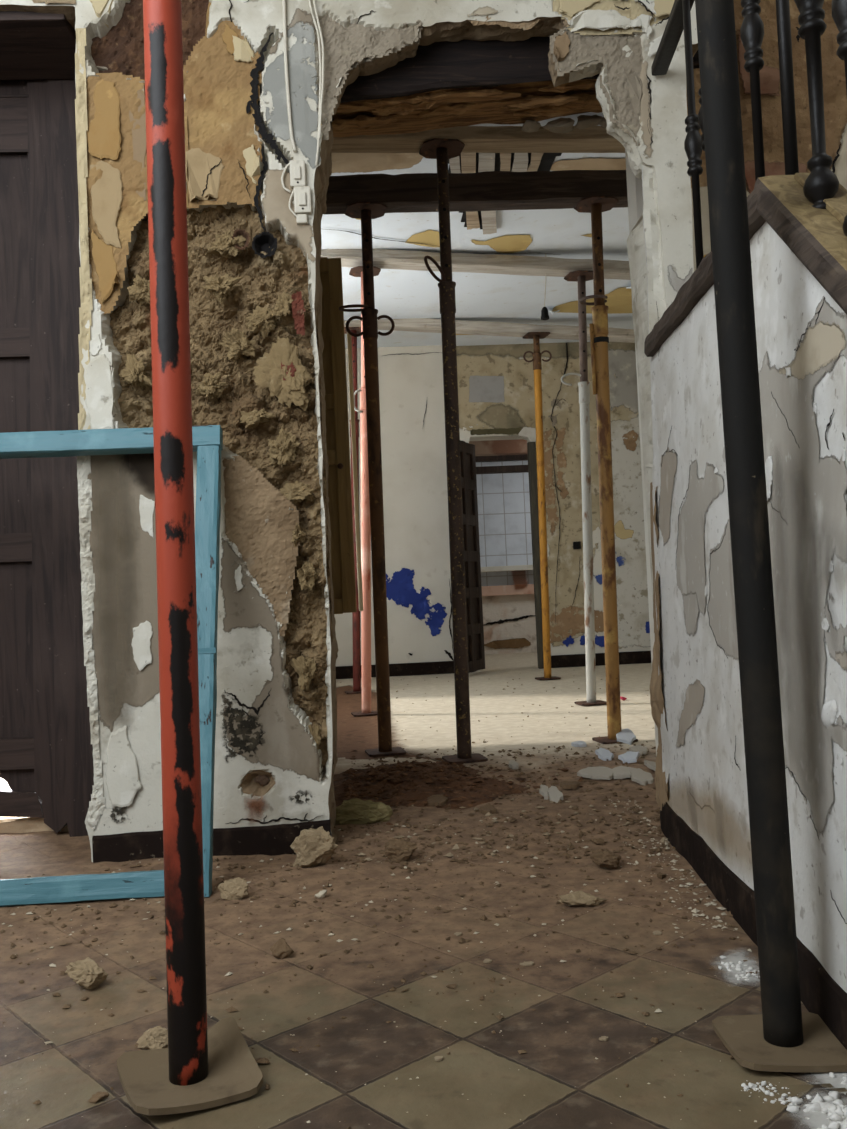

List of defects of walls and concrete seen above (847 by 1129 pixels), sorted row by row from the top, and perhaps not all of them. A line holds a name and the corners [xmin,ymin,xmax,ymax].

flaking render [467,6,541,30]
spalling [550,0,675,159]
flaking render [75,0,153,430]
peeling [405,230,440,247]
peeling [471,235,532,253]
flaking render [77,454,160,830]
spalling [181,0,423,803]
crack [447,581,455,649]
flaking render [484,638,531,649]
crack [483,361,581,626]
peeling [548,349,739,811]
peeling [759,296,847,837]